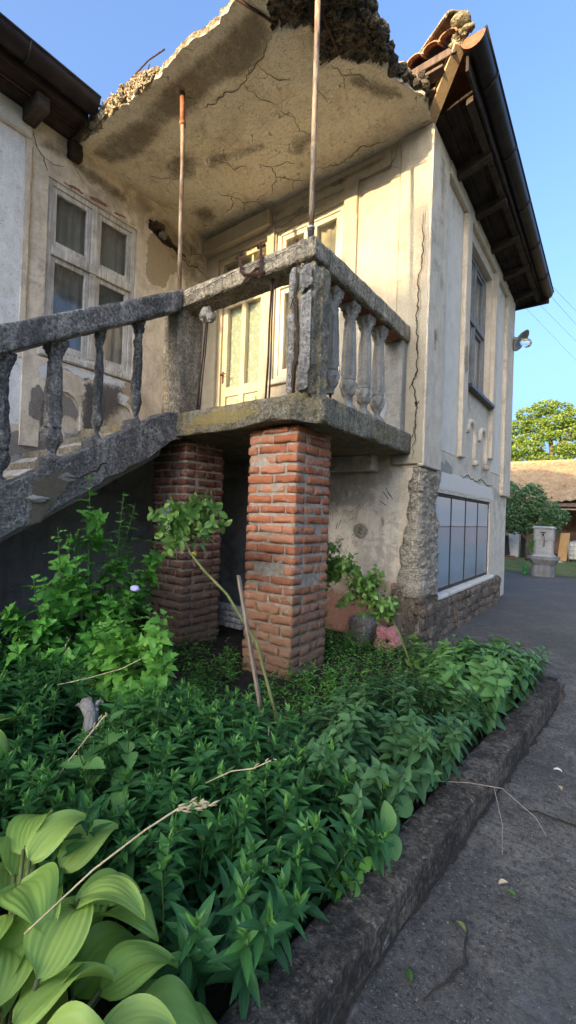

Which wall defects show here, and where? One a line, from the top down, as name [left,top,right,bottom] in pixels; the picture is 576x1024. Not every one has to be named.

spalling [77,48,165,143]
damp [99,15,265,161]
crack [200,36,311,135]
damp [168,157,195,177]
crack [209,139,399,220]
peeling [64,182,186,288]
crack [409,210,426,460]
peeling [8,363,47,456]
peeling [62,366,131,429]
flaking render [390,467,441,598]
flaking render [326,590,388,638]